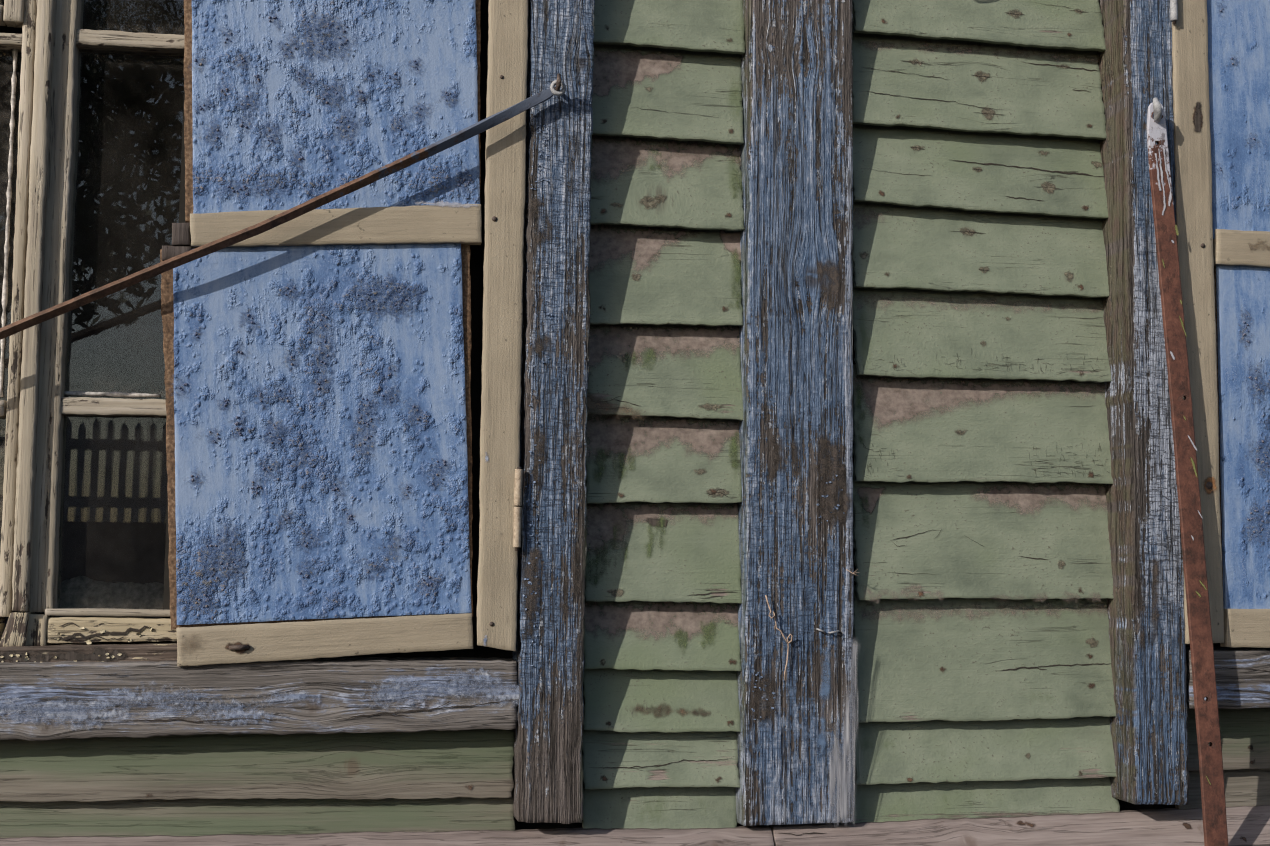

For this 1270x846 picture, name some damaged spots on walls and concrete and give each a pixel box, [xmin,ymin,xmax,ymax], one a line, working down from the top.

peeling [592,50,684,96]
corrosion [1193,102,1203,132]
peeling [591,135,741,181]
peeling [589,224,696,271]
peeling [589,324,740,366]
peeling [854,377,1105,427]
peeling [574,394,739,480]
peeling [813,435,885,528]
peeling [978,482,1107,514]
peeling [521,405,545,666]
peeling [560,503,738,648]
peeling [0,648,127,663]